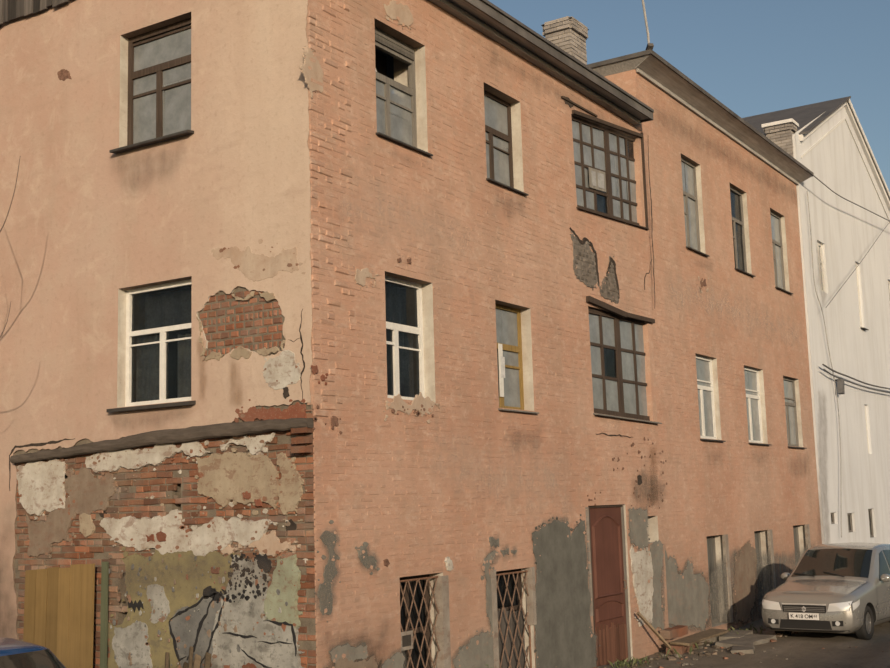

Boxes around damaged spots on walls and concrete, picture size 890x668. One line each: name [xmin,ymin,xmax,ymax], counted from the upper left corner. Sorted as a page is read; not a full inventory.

flaking render [570,227,620,304]
flaking render [196,290,286,383]
crack [290,309,305,404]
spalling [612,437,667,556]